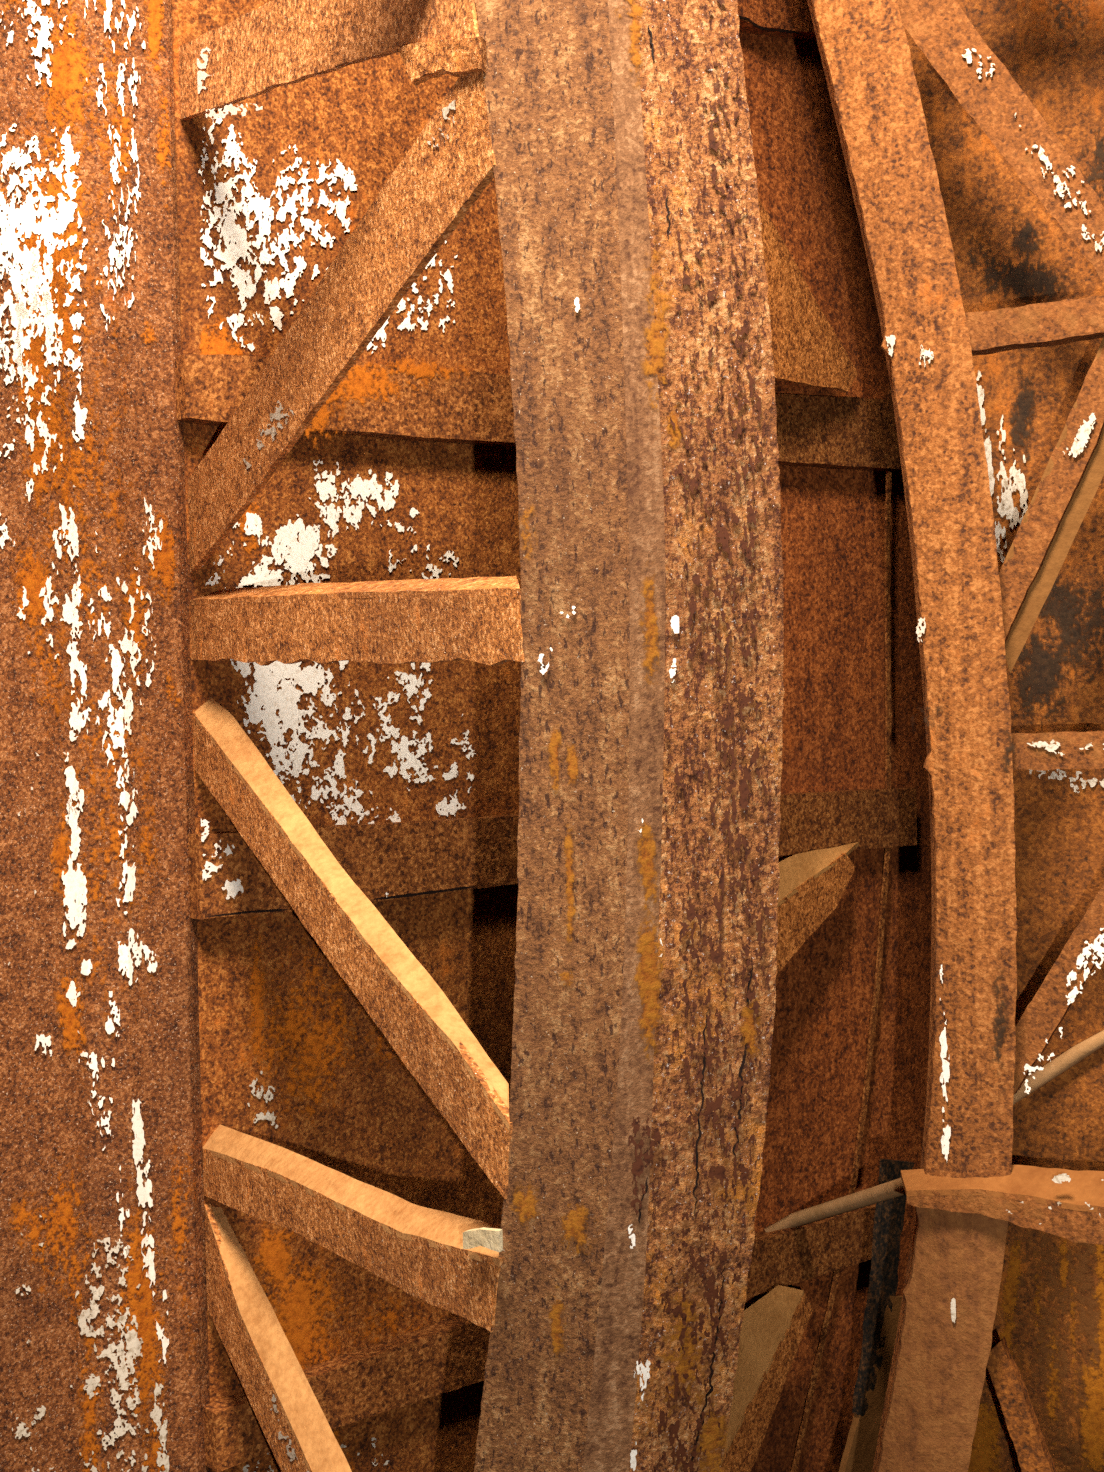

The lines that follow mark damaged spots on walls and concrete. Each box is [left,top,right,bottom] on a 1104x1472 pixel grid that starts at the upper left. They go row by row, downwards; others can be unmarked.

peeling [0,0,145,501]
peeling [197,47,357,351]
peeling [367,241,457,354]
corrosion [0,0,176,1055]
peeling [17,497,163,1007]
peeling [230,659,476,825]
corrosion [634,61,771,1472]
corrosion [9,1170,96,1306]
peeling [70,1099,169,1472]
corrosion [118,1149,194,1472]
corrosion [968,1404,1001,1472]
corrosion [1047,1240,1104,1471]